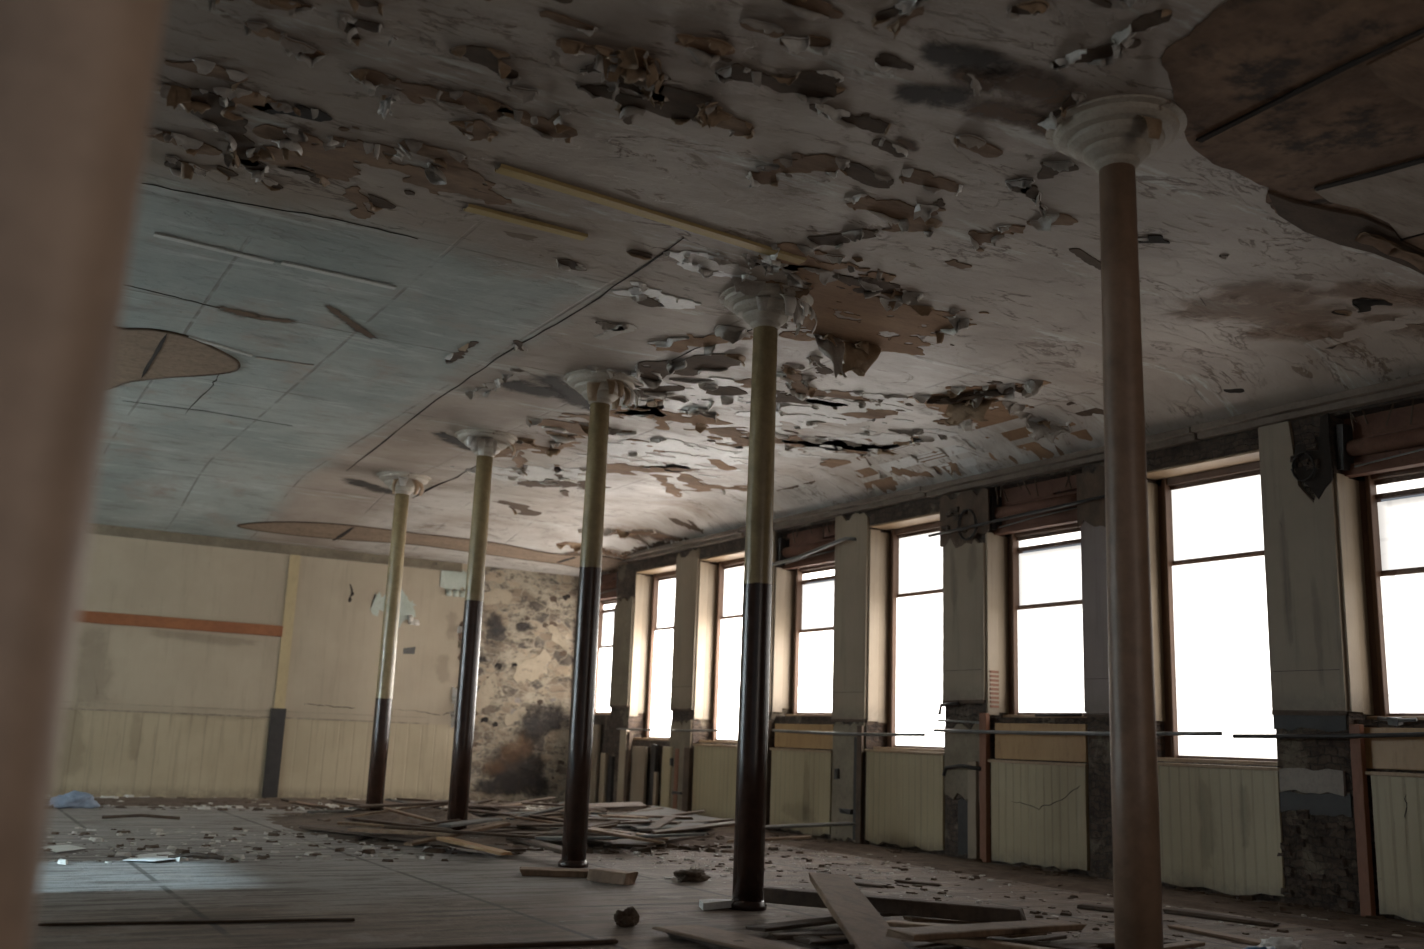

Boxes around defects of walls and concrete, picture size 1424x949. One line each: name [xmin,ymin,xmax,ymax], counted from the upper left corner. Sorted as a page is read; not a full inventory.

peeling [335,0,398,47]
peeling [1049,0,1172,71]
peeling [147,45,578,219]
peeling [1138,235,1170,244]
peeling [539,0,1106,548]
peeling [1332,297,1393,316]
peeling [444,341,479,365]
peeling [450,407,590,516]
peeling [556,529,582,553]
peeling [602,518,704,555]
damp [486,613,531,636]
damp [476,704,569,797]